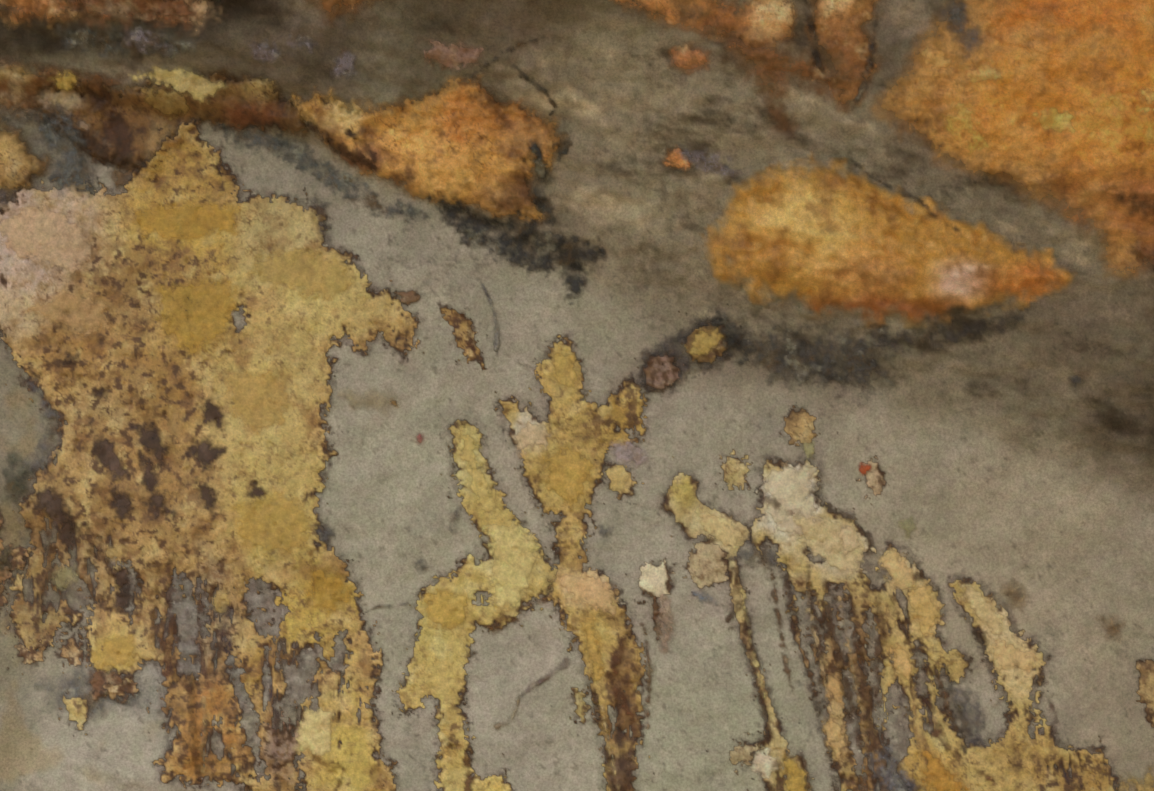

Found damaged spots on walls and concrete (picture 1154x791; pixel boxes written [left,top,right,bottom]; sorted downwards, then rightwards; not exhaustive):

rust [0,0,207,25]
rust [0,40,560,220]
rust [614,0,879,117]
rust [882,0,1154,274]
water stain [0,113,911,791]
water stain [637,405,1120,791]
water stain [1136,659,1154,728]